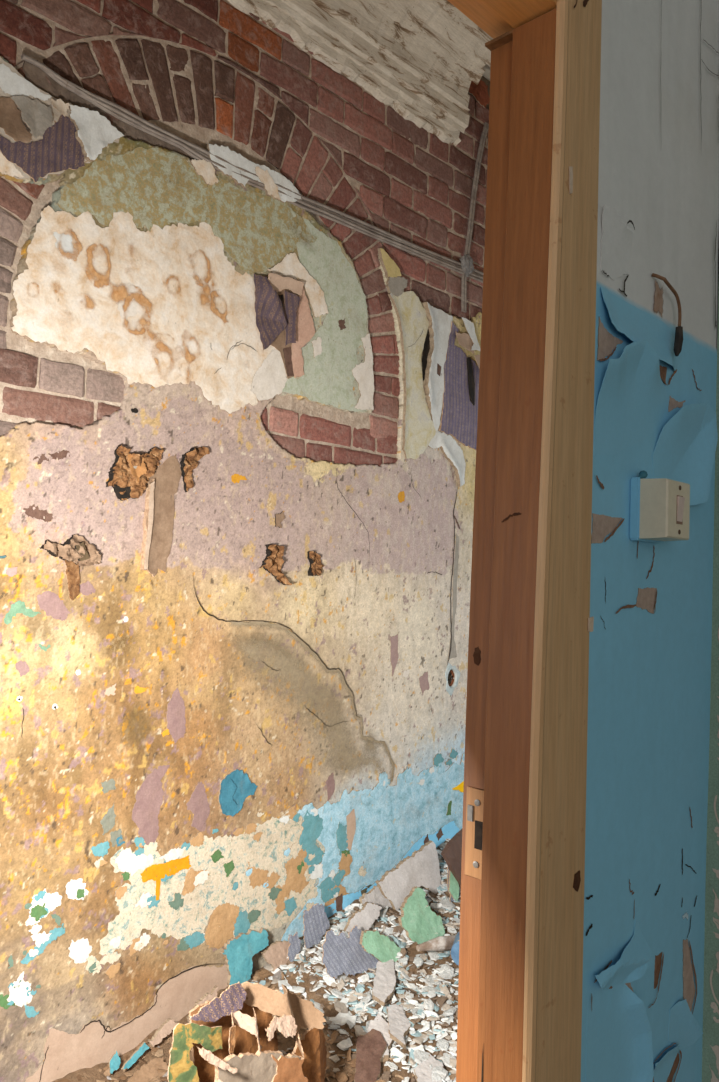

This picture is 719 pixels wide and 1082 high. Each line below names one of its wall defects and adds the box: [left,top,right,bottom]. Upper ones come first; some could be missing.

flaking render [0,0,490,487]
peeling [594,287,718,506]
peeling [591,513,625,544]
crack [192,569,363,734]
peeling [0,749,465,1018]
peeling [25,963,229,1082]
peeling [585,917,703,1082]